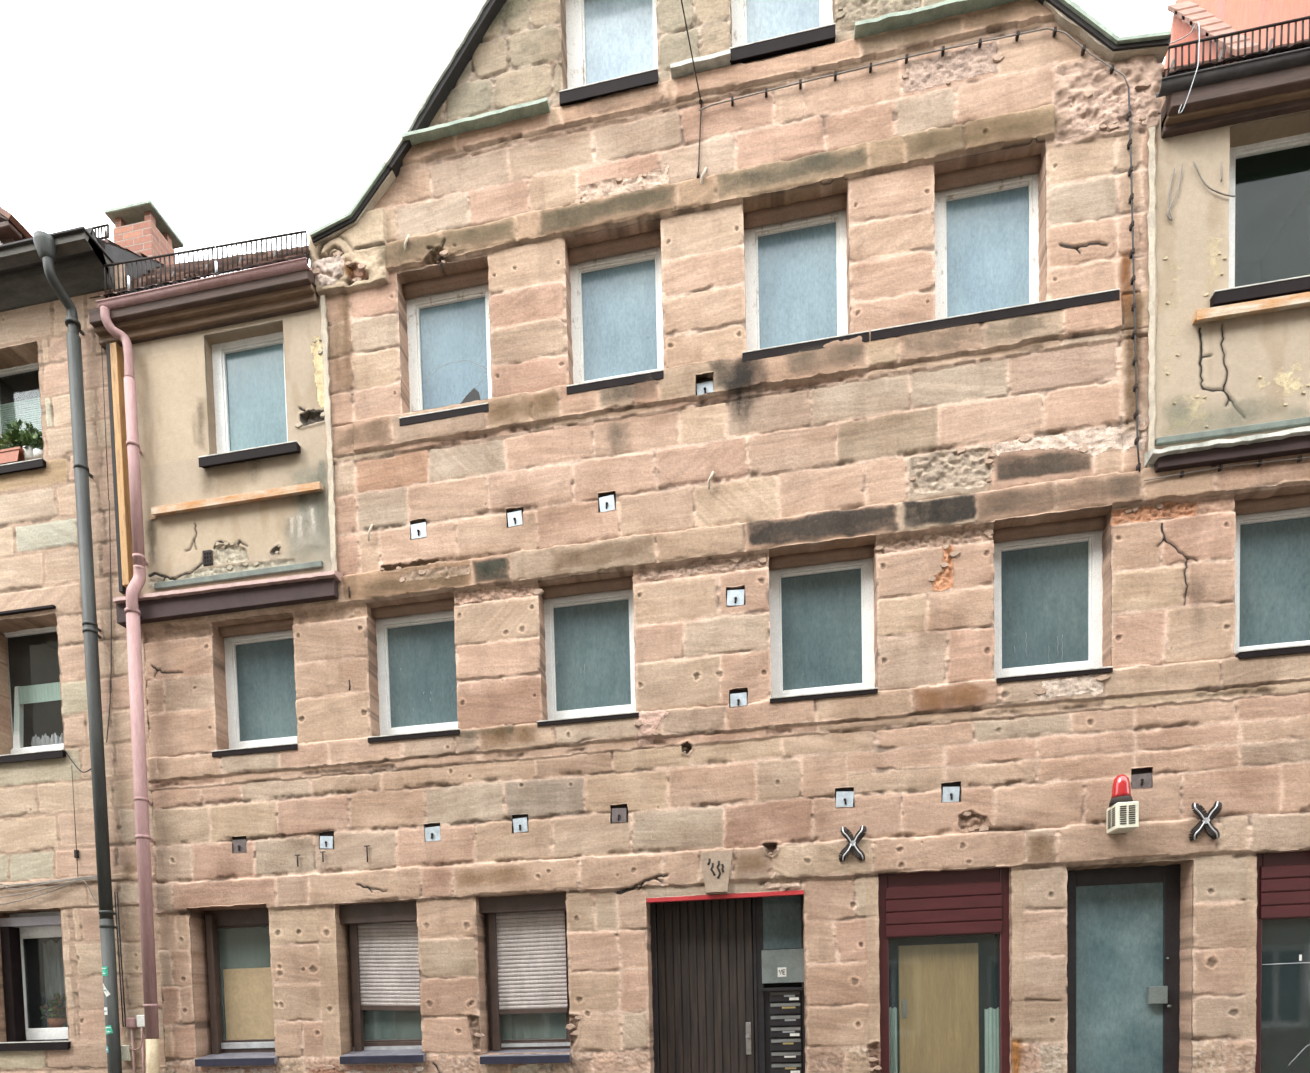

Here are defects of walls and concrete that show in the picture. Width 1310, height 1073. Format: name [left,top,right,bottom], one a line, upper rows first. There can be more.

spalling [1069,79,1151,138]
spalling [312,251,368,287]
crack [1198,325,1244,417]
spalling [909,418,1149,495]
flaking render [148,542,296,587]
crack [1157,523,1197,605]